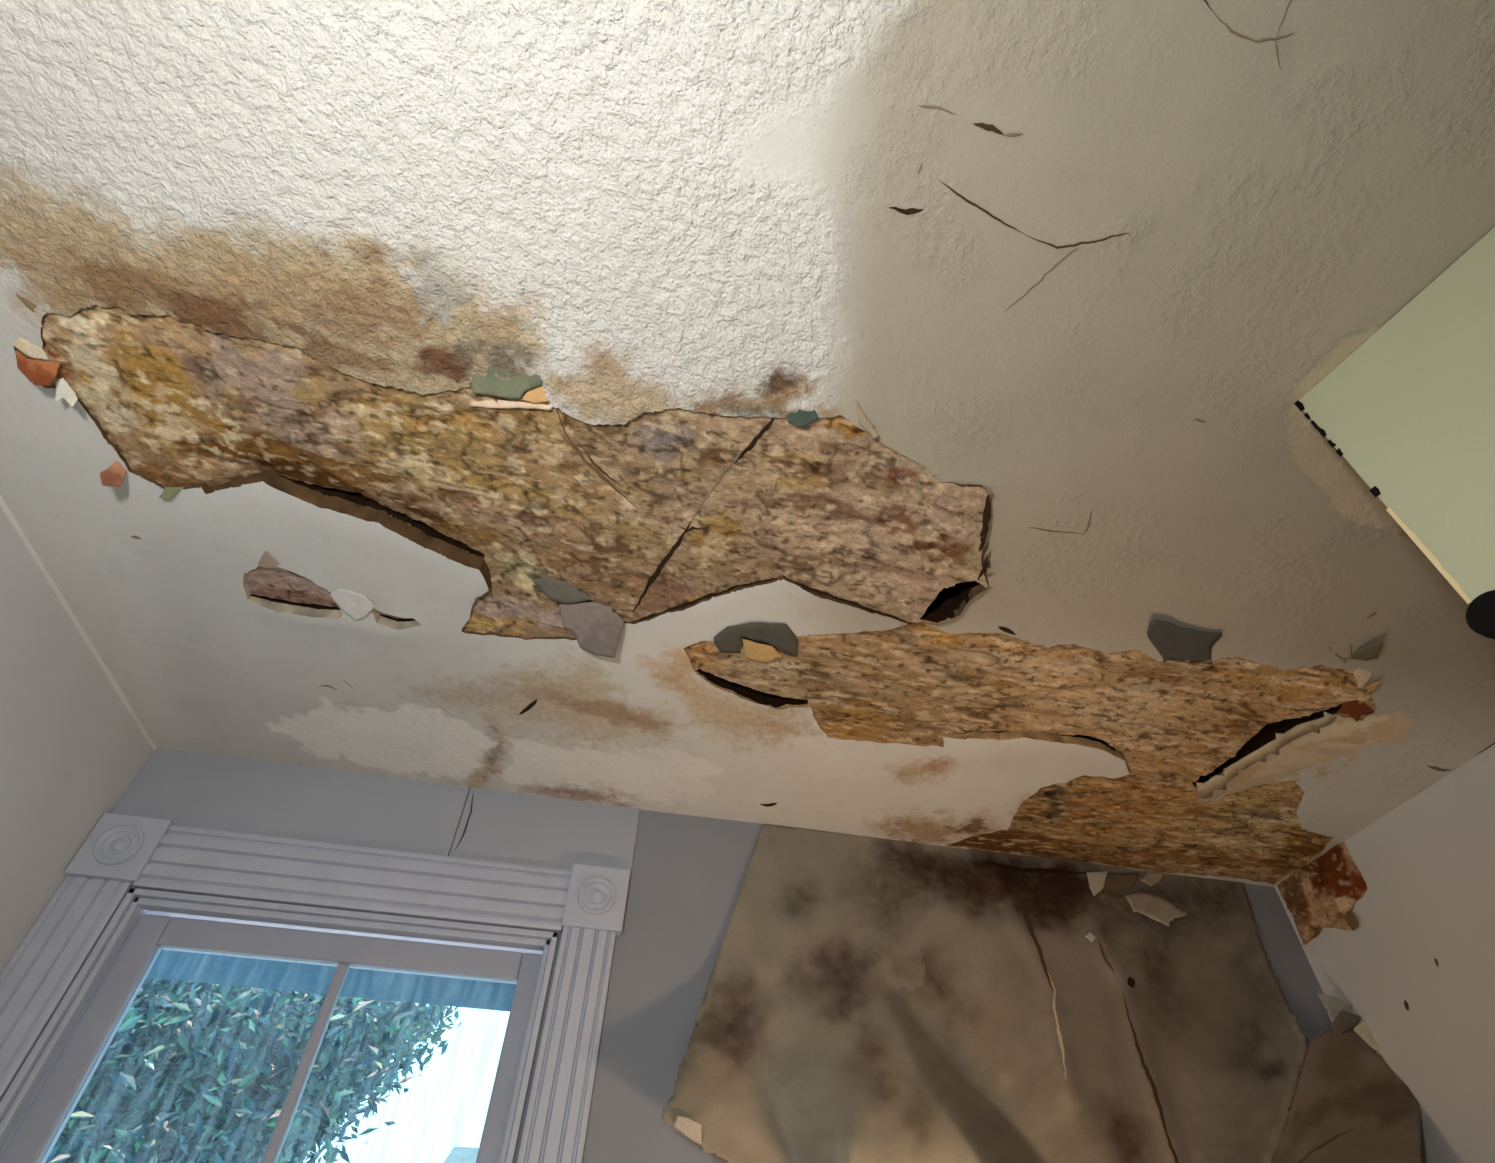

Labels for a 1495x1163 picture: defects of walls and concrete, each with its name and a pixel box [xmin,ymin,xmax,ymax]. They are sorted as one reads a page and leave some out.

crack [919,105,1022,137]
crack [1204,0,1294,69]
damp [0,145,857,426]
crack [889,163,1129,311]
peeling [12,294,1423,885]
damp [368,630,835,810]
damp [851,746,1092,927]